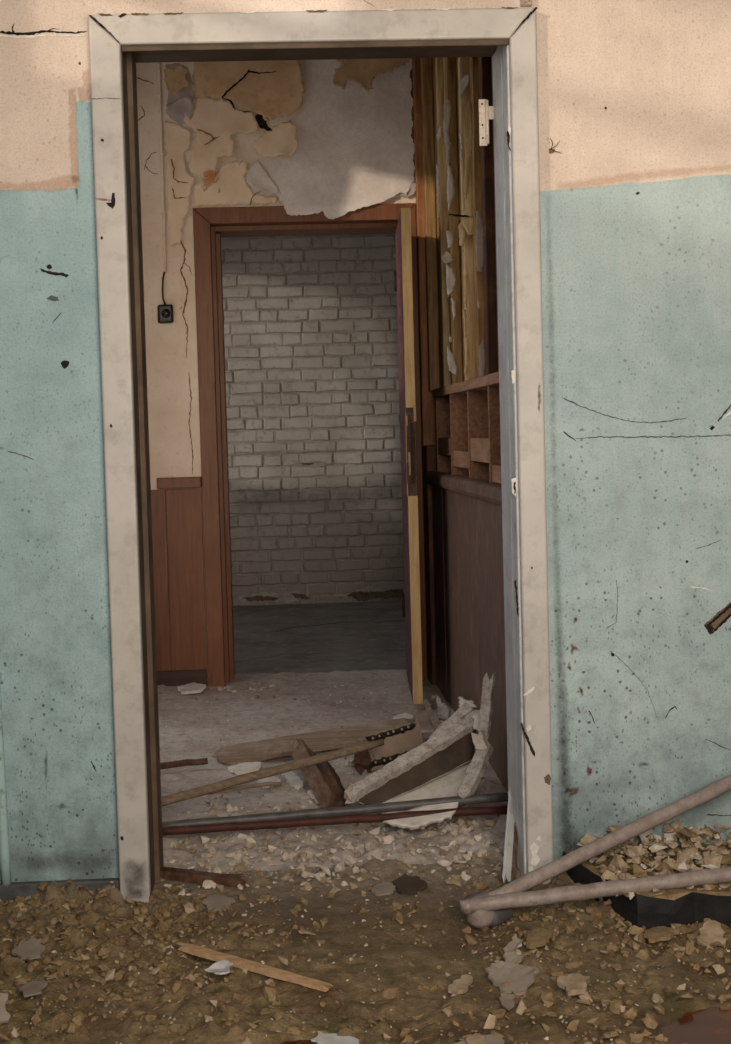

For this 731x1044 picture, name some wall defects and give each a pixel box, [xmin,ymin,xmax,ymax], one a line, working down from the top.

crack [0,15,120,43]
peeling [163,58,416,246]
crack [178,241,194,474]
crack [564,398,731,439]